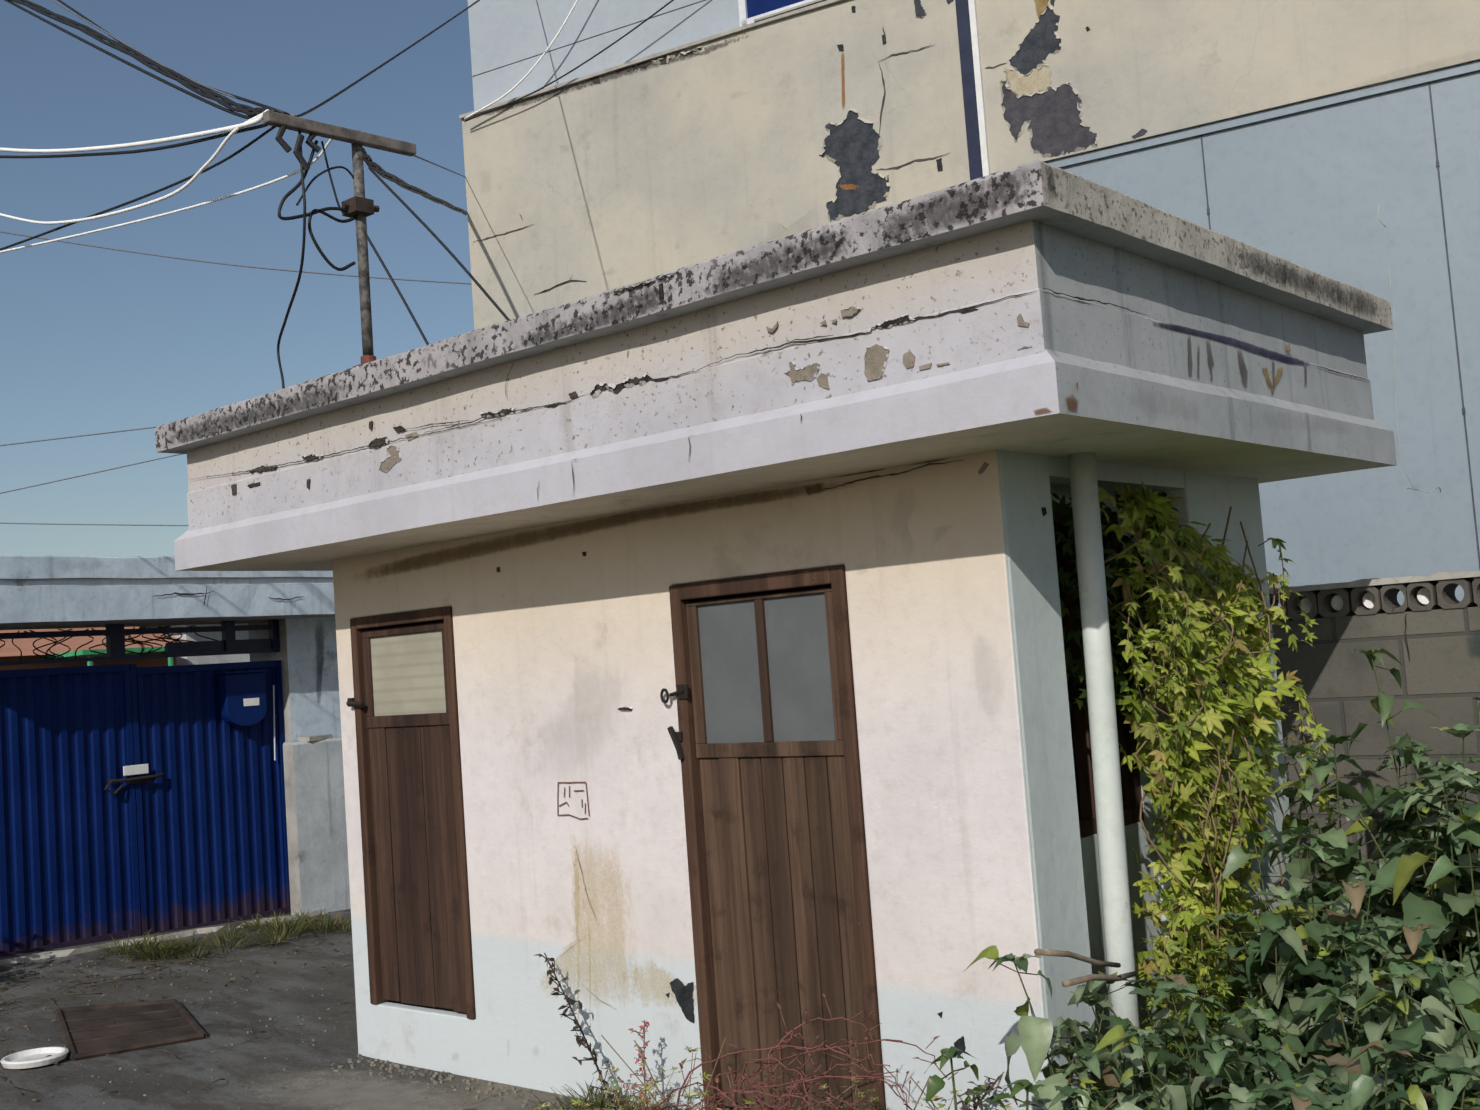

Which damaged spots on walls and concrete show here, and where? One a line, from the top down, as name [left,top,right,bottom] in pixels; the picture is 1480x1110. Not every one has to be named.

peeling [999,0,1099,158]
peeling [819,108,891,222]
leakage [883,172,1025,242]
leakage [715,232,843,294]
leakage [528,288,670,342]
peeling [784,361,830,390]
peeling [820,306,860,325]
crack [657,288,1149,379]
peeling [864,314,949,381]
crack [191,363,588,480]
spalling [665,978,695,1023]